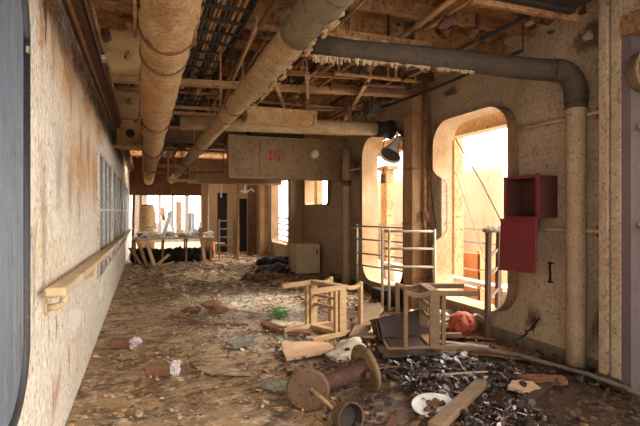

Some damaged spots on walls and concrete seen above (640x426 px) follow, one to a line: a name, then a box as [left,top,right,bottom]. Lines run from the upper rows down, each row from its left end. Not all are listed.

peeling [304,11,475,74]
damp [43,0,123,165]
peeling [245,62,292,110]